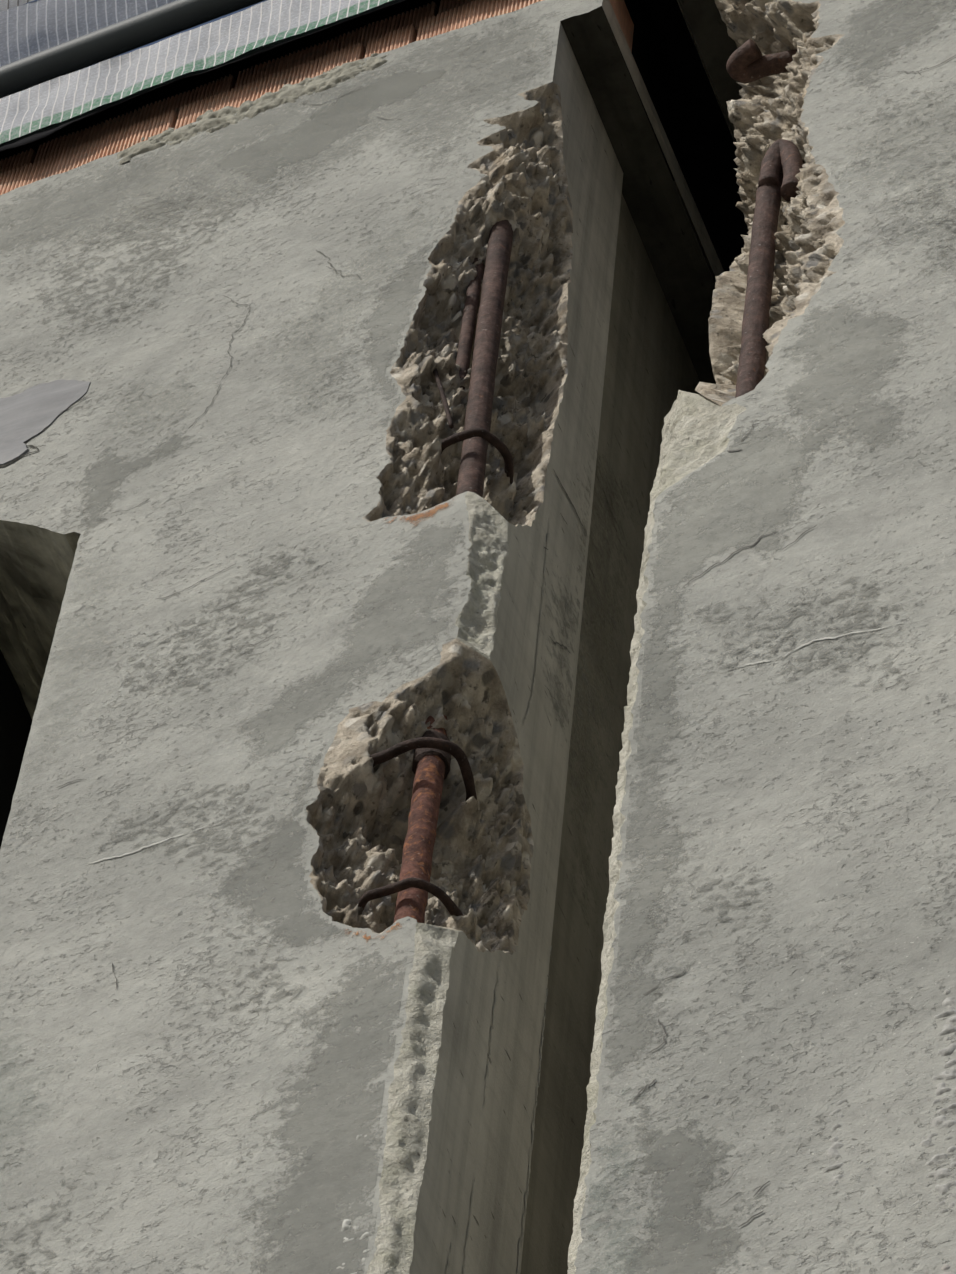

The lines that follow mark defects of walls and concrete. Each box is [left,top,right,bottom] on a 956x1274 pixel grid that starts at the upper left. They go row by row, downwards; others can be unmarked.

crack [188,295,250,429]
spalling [306,82,573,1274]
spalling [567,0,848,1274]